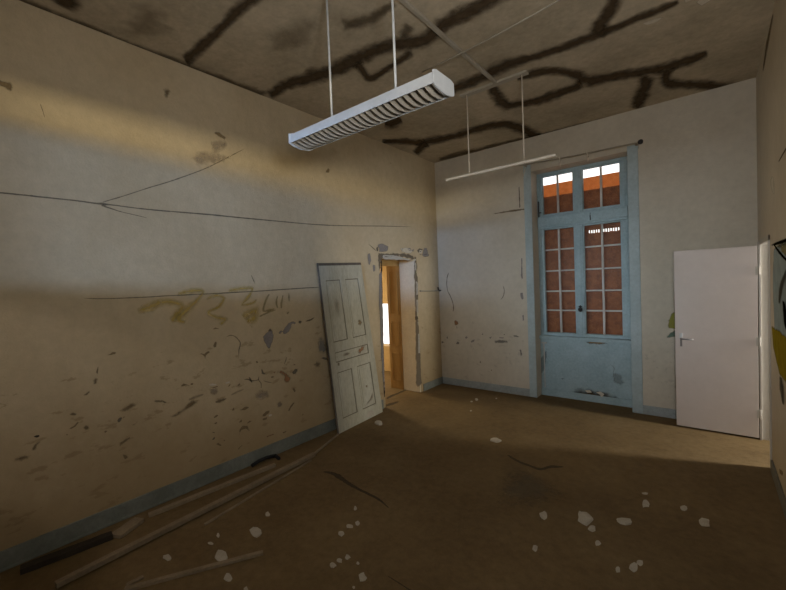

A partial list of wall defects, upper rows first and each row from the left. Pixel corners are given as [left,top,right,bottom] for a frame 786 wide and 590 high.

damp [19,0,500,97]
damp [454,0,728,110]
crack [763,15,773,70]
damp [385,117,402,128]
damp [383,121,582,160]
crack [0,151,346,226]
spalling [368,244,429,397]